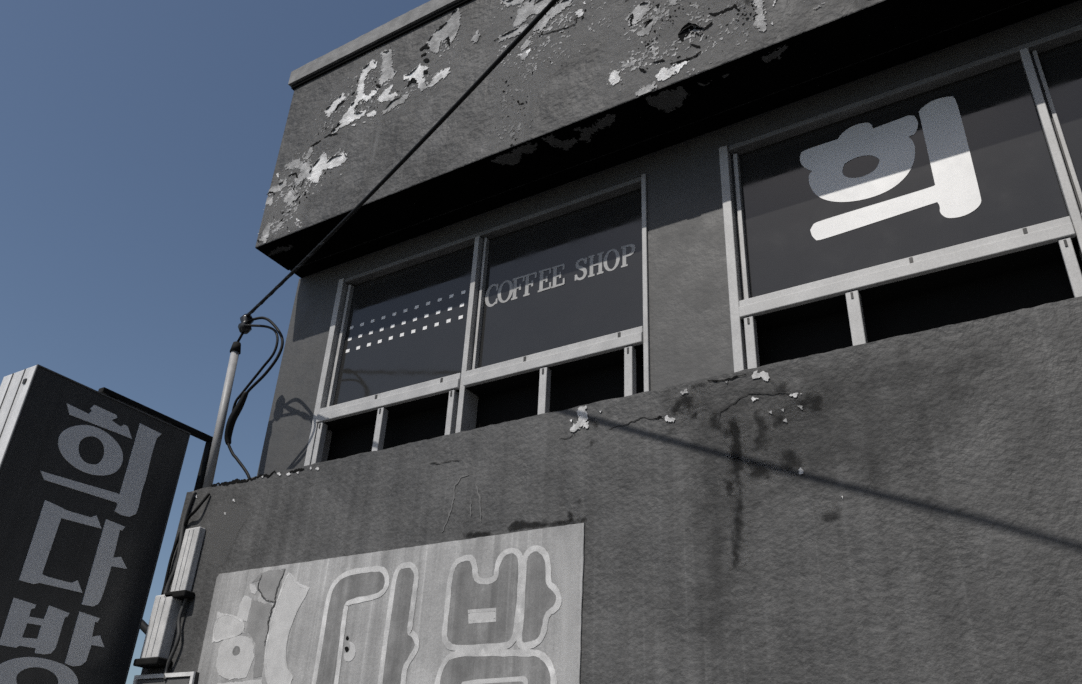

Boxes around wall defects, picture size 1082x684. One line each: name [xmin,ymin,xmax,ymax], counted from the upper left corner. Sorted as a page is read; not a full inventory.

peeling [257,8,480,256]
peeling [490,0,616,166]
peeling [609,0,776,113]
water stain [672,396,696,417]
water stain [710,416,765,491]